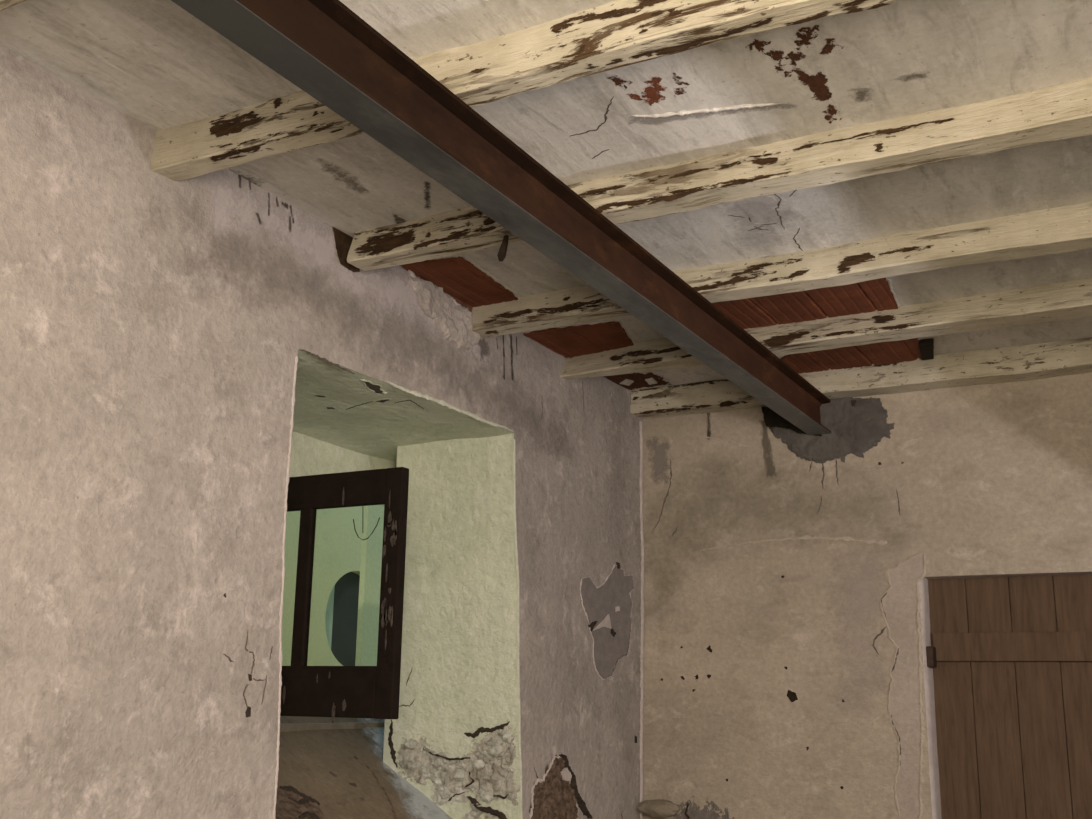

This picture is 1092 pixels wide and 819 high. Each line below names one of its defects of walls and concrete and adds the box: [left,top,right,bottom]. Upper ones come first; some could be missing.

peeling [550,0,682,58]
flaking render [586,0,890,124]
peeling [209,98,351,164]
crack [571,98,613,159]
peeling [792,118,954,152]
crack [729,190,803,251]
flaking render [332,212,748,414]
peeling [692,256,810,291]
flaking render [712,245,934,374]
flaking render [580,562,635,680]
crack [224,626,273,717]
spalling [396,719,592,819]